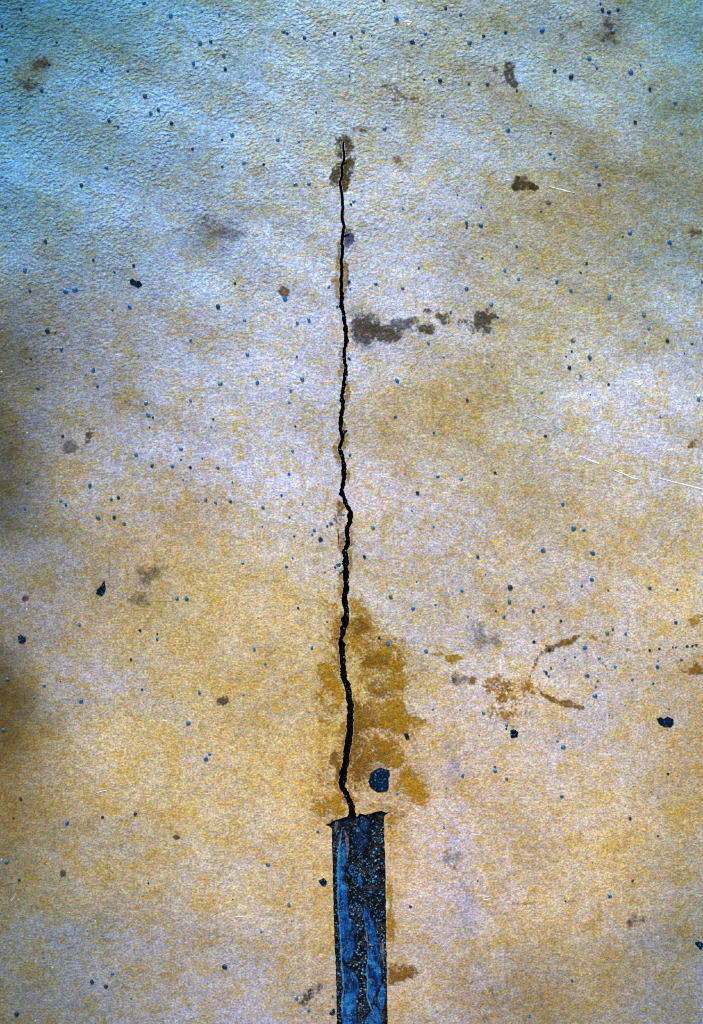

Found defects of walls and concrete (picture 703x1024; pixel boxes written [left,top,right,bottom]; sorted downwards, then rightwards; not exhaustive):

crack [336,140,356,817]
leakage [354,308,496,348]